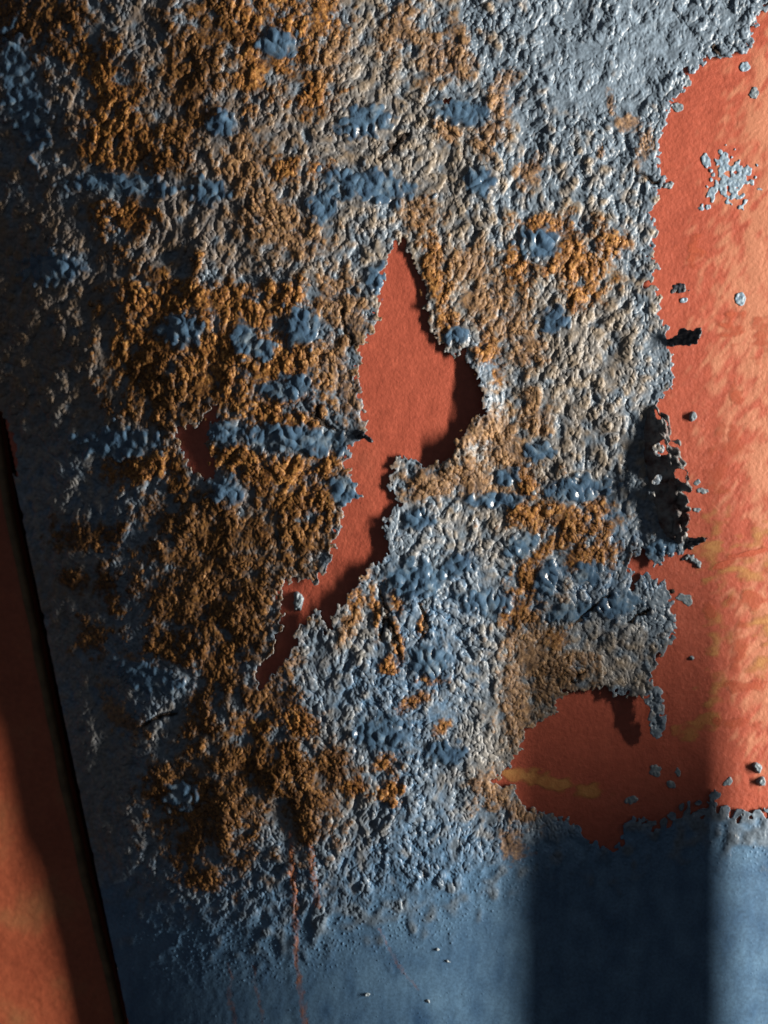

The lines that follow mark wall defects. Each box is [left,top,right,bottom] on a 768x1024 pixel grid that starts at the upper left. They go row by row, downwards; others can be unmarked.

corrosion [378,6,470,88]
corrosion [475,74,512,155]
corrosion [608,96,650,155]
peeling [175,404,220,482]
corrosion [0,0,406,984]
peeling [255,237,489,691]
corrosion [399,195,634,752]
peeling [490,2,768,852]
corrosion [473,768,600,859]